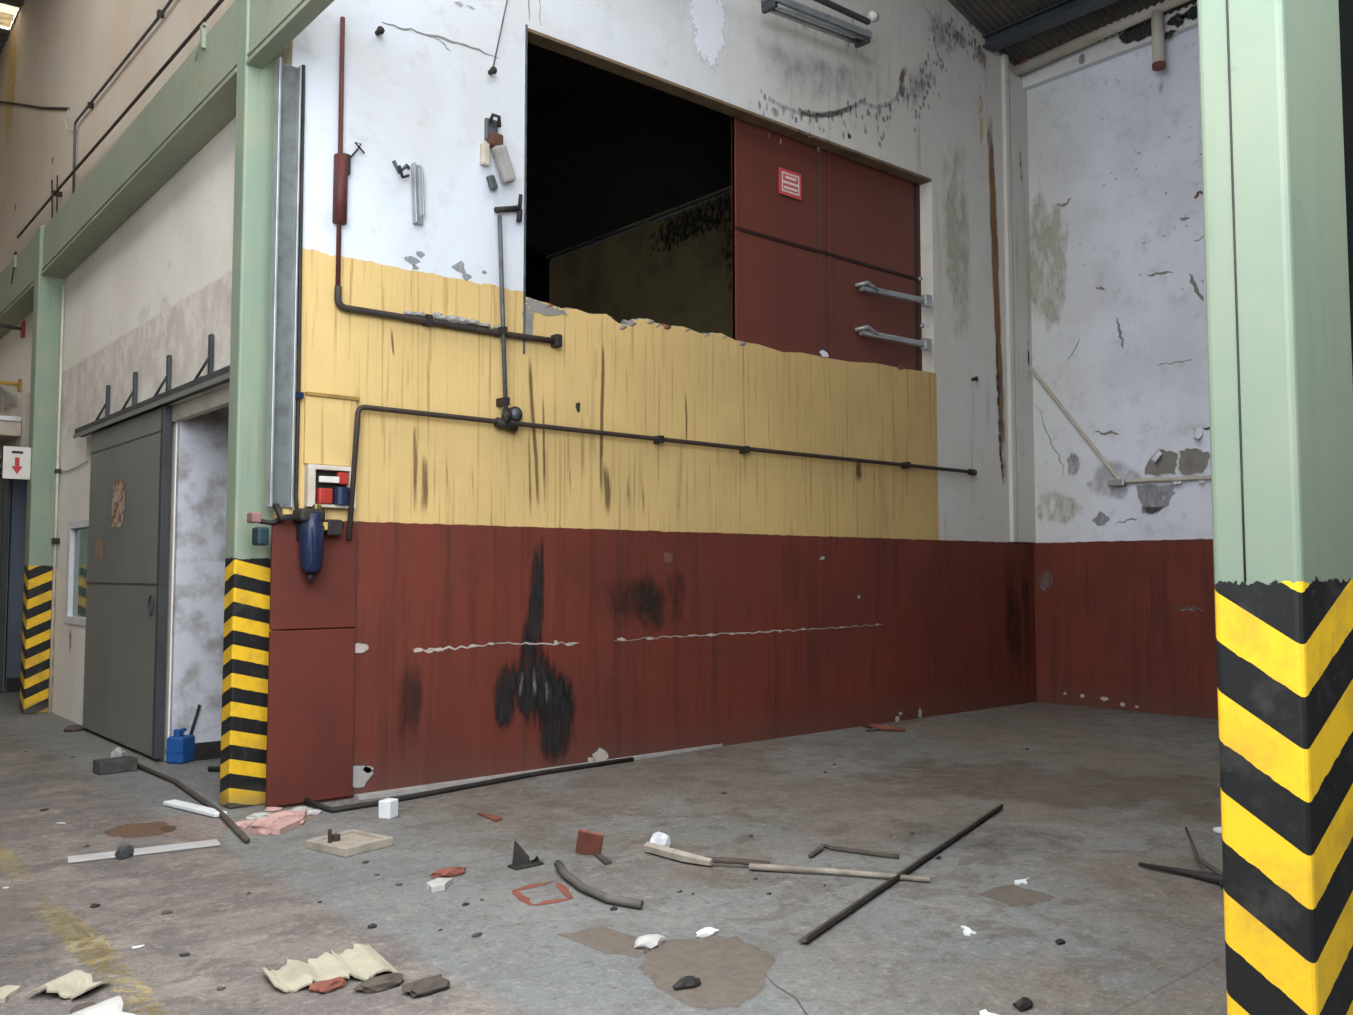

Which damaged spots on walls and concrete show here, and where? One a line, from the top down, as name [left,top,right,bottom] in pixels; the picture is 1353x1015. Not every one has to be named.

damp [795,18,980,151]
spalling [522,298,568,335]
peeling [1137,446,1211,513]
damp [495,547,573,759]